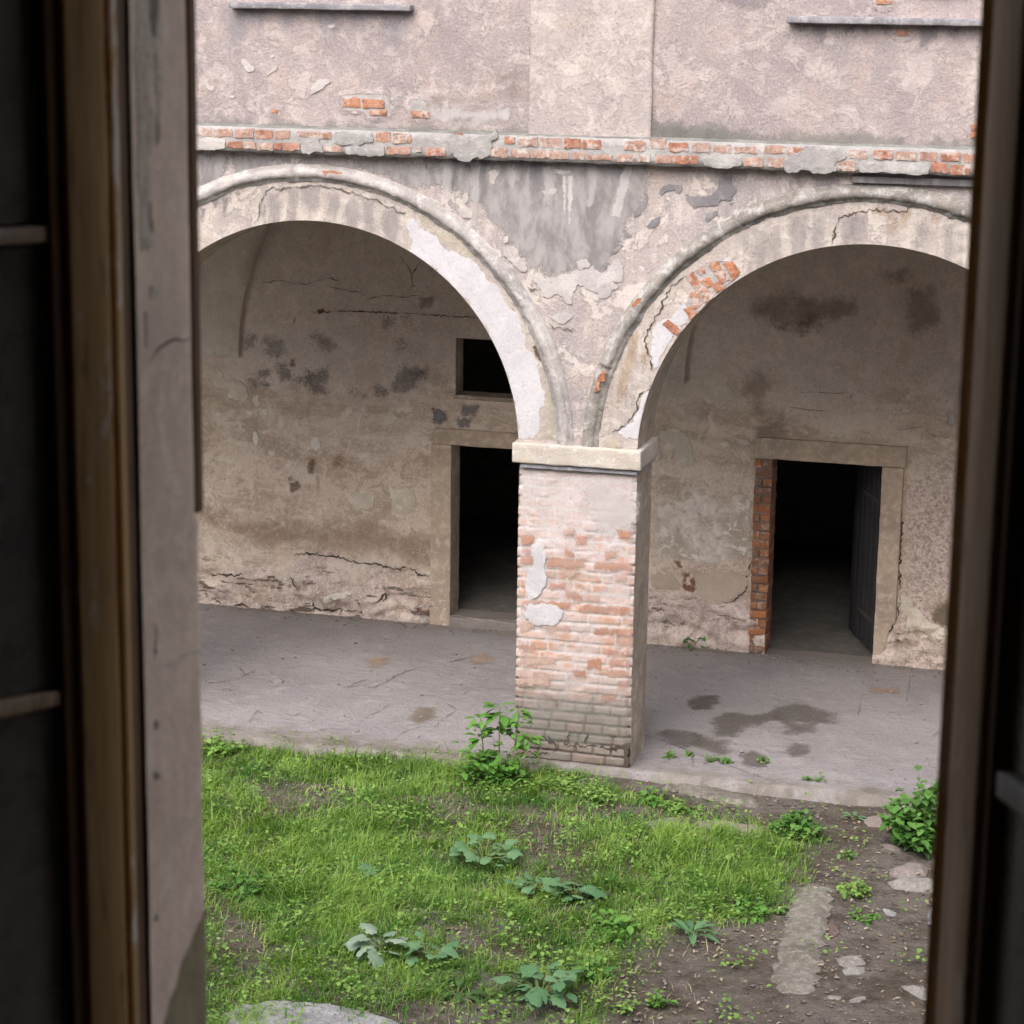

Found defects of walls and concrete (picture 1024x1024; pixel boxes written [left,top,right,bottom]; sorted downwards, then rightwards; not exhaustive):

peeling [197,79,975,228]
crack [831,207,909,245]
crack [259,259,475,325]
peeling [406,215,556,441]
spalling [650,257,742,368]
damp [249,365,330,392]
damp [363,366,428,397]
peeling [604,389,650,448]
crack [211,573,270,609]
crack [290,552,425,614]
peeling [518,527,632,686]
damp [662,695,831,767]